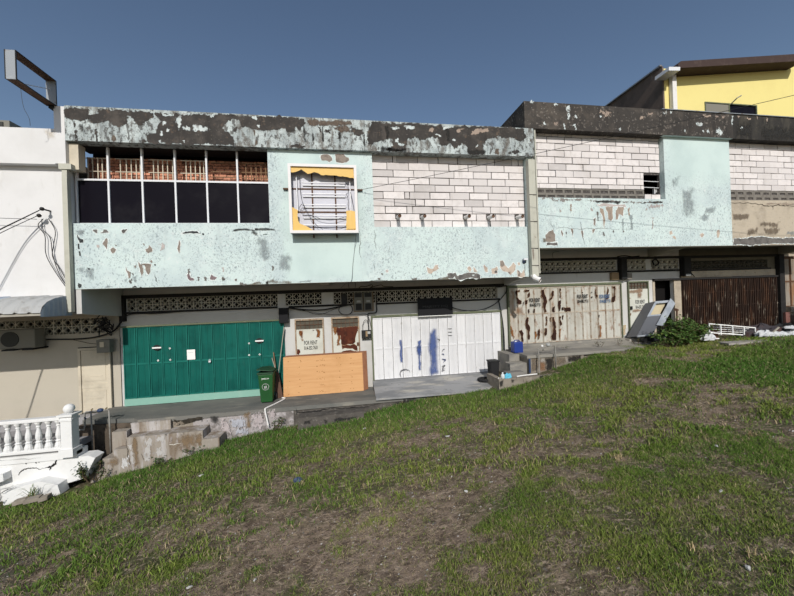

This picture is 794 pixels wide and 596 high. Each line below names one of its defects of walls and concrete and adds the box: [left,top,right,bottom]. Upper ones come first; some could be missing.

peeling [64,107,531,164]
peeling [696,114,768,135]
spalling [76,228,117,256]
peeling [543,203,633,246]
leakage [748,222,778,235]
spalling [125,243,165,288]
peeling [186,267,238,281]
spalling [426,260,526,281]
corrosion [510,288,571,342]
crack [0,458,57,493]